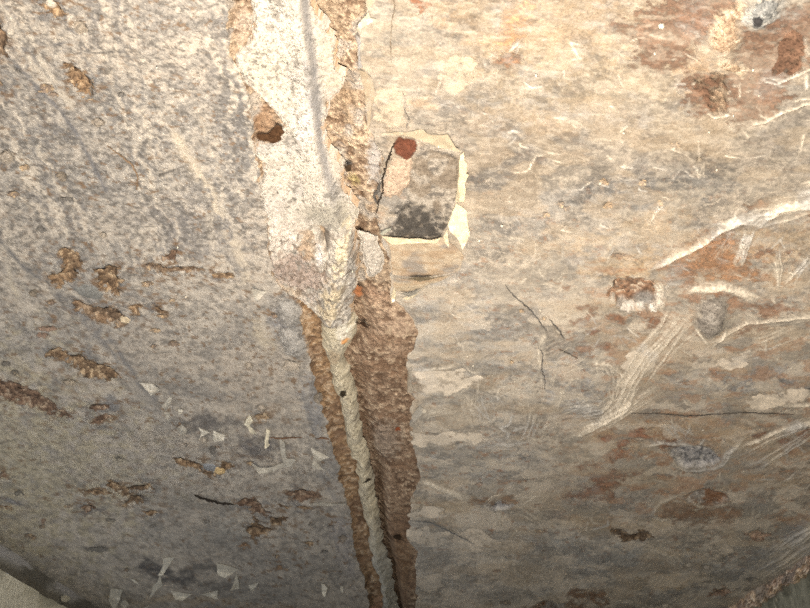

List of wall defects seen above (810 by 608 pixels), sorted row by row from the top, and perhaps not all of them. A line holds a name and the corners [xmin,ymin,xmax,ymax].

spalling [0,23,9,58]
spalling [225,0,254,64]
rust [610,0,810,128]
spalling [239,73,285,185]
spalling [316,0,459,608]
spalling [37,325,118,382]
spalling [0,361,74,419]
spalling [281,294,383,608]
spalling [84,480,157,527]
spalling [234,489,322,540]